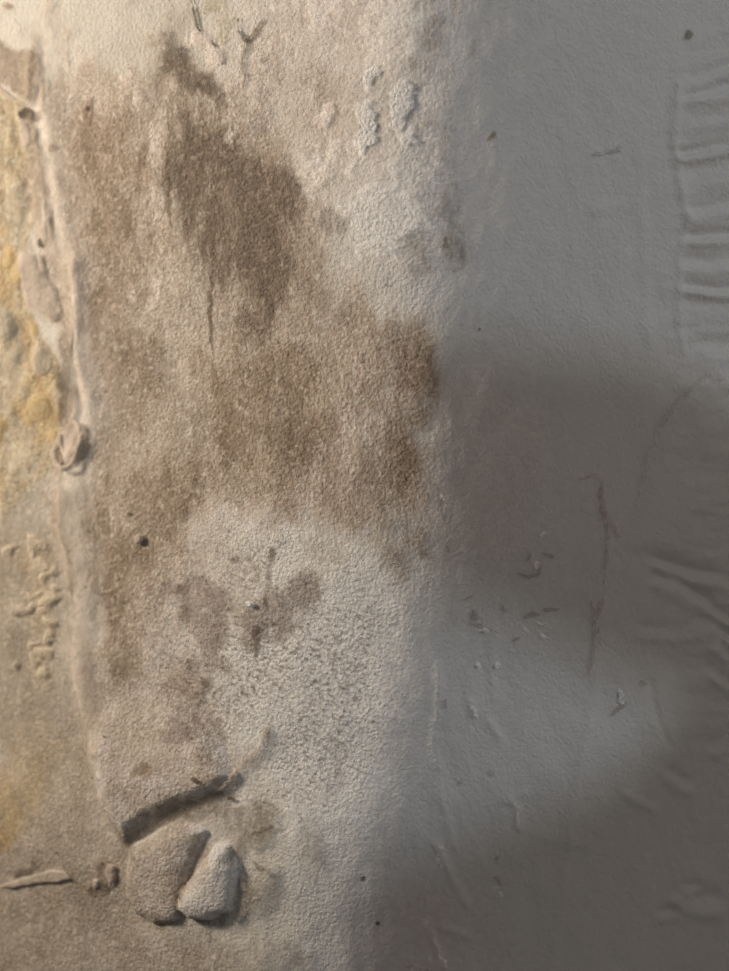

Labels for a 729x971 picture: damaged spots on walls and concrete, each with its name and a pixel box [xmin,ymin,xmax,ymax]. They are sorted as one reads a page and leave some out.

peeling [0,88,203,971]
leakage [0,32,438,923]
crack [182,1,264,88]